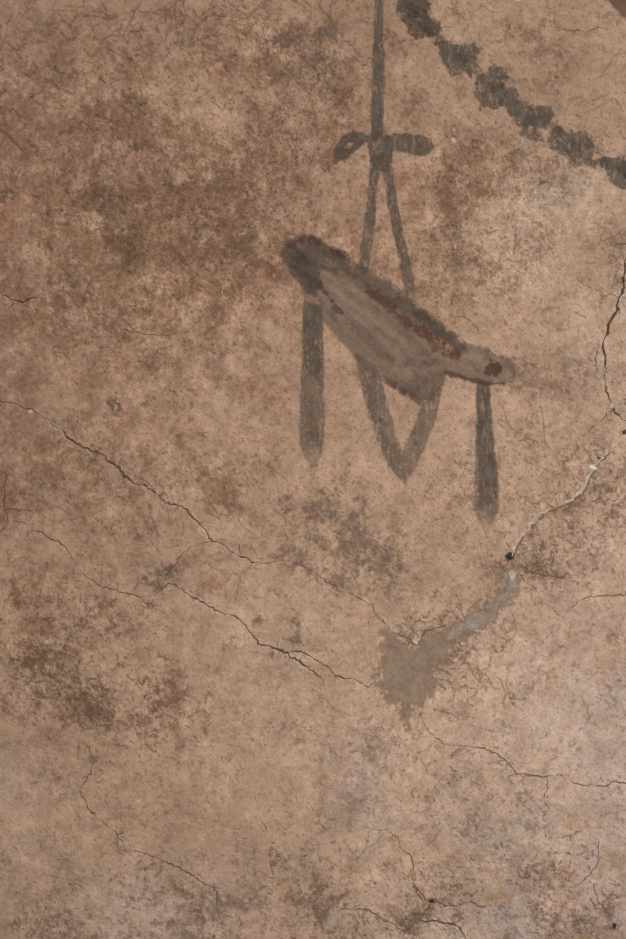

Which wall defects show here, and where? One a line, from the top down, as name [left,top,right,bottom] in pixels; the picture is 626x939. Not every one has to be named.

crack [595,243,626,434]
crack [1,401,302,566]
crack [89,556,373,687]
crack [324,579,445,646]
crack [79,743,123,843]
crack [424,725,626,796]
crack [145,853,218,906]
crack [340,835,485,937]